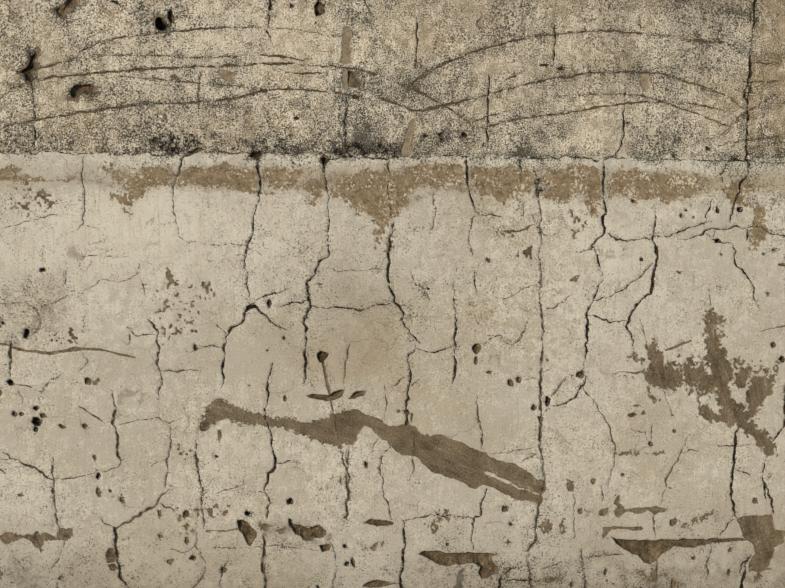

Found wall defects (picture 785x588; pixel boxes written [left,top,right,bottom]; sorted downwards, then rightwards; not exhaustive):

crack [0,76,213,230]
peeling [98,155,701,253]
peeling [0,528,73,552]
crack [0,270,88,401]
crack [0,392,182,588]
crack [127,319,199,399]
flaking render [206,519,331,552]
peeling [198,351,546,512]
spalling [419,551,499,588]
crack [170,0,785,588]
peeling [601,307,781,457]
peeling [599,495,785,588]